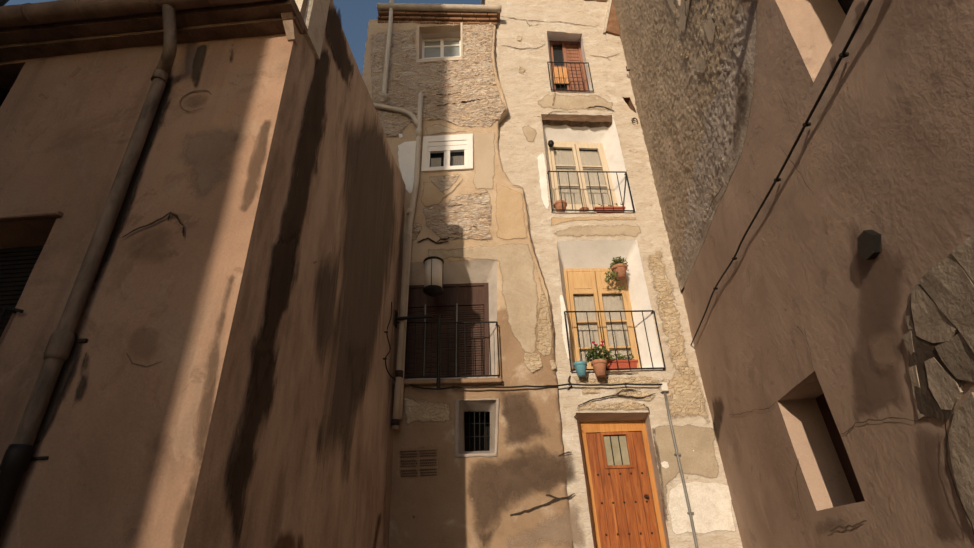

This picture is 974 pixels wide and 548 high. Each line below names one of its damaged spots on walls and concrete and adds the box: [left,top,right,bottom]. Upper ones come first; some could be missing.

leakage [191,45,206,87]
leakage [93,69,172,290]
crack [122,212,185,238]
leakage [226,5,354,548]
leakage [315,118,395,475]
spalling [398,133,527,240]
leakage [196,276,232,456]
spalling [906,301,961,421]
leakage [173,489,194,548]